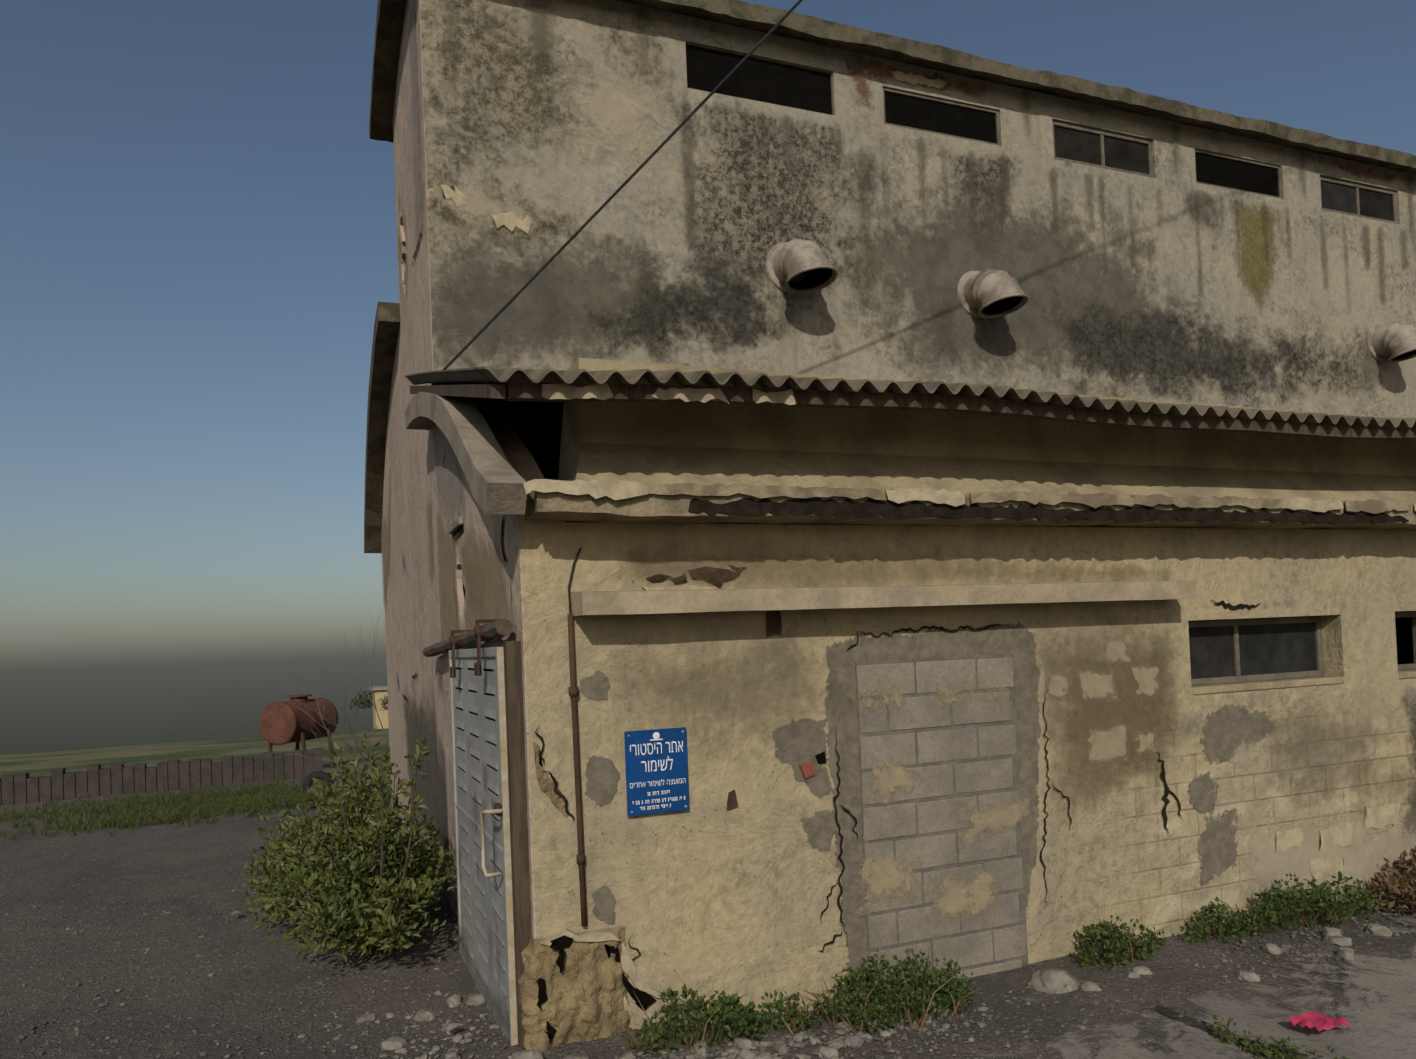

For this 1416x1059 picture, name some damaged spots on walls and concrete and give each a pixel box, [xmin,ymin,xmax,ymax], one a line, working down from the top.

peeling [398,2,534,285]
water stain [423,0,1362,401]
peeling [433,429,506,641]
spalling [642,564,747,590]
peeling [523,479,1416,525]
spalling [533,726,574,820]
spalling [792,751,827,782]
crack [1156,751,1183,833]
flaking render [518,926,656,1053]